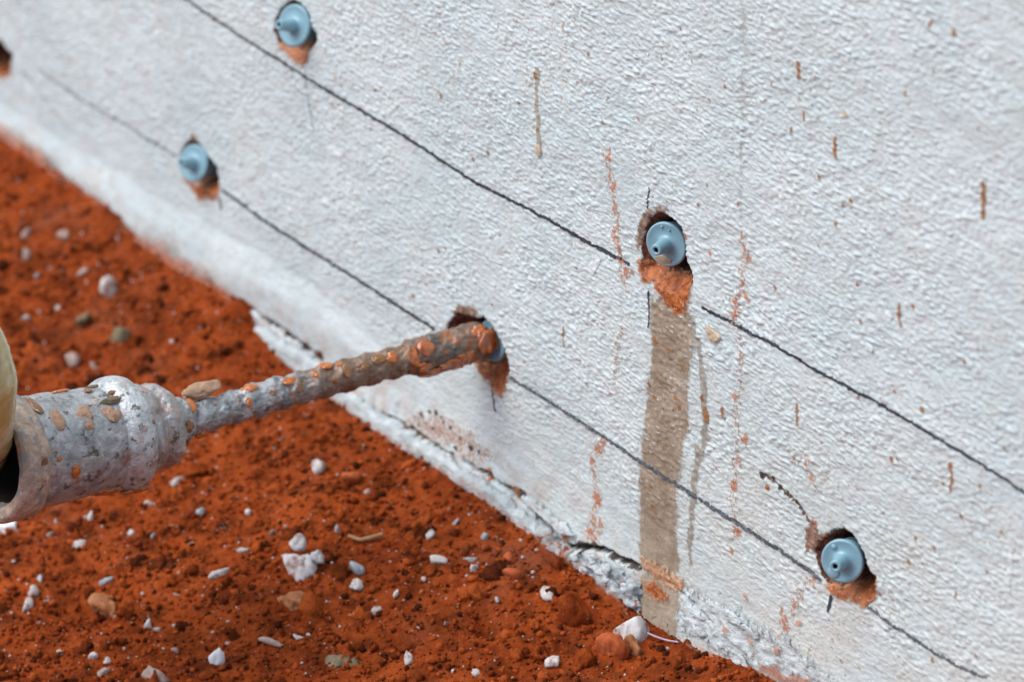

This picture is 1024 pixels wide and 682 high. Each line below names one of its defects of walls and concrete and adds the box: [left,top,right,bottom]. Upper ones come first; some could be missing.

corrosion [278,40,311,67]
corrosion [183,177,220,201]
corrosion [637,259,693,317]
crack [259,312,324,362]
corrosion [473,357,510,398]
damp [639,231,752,636]
crack [382,411,642,572]
crack [759,471,810,522]
corrosion [824,573,877,609]